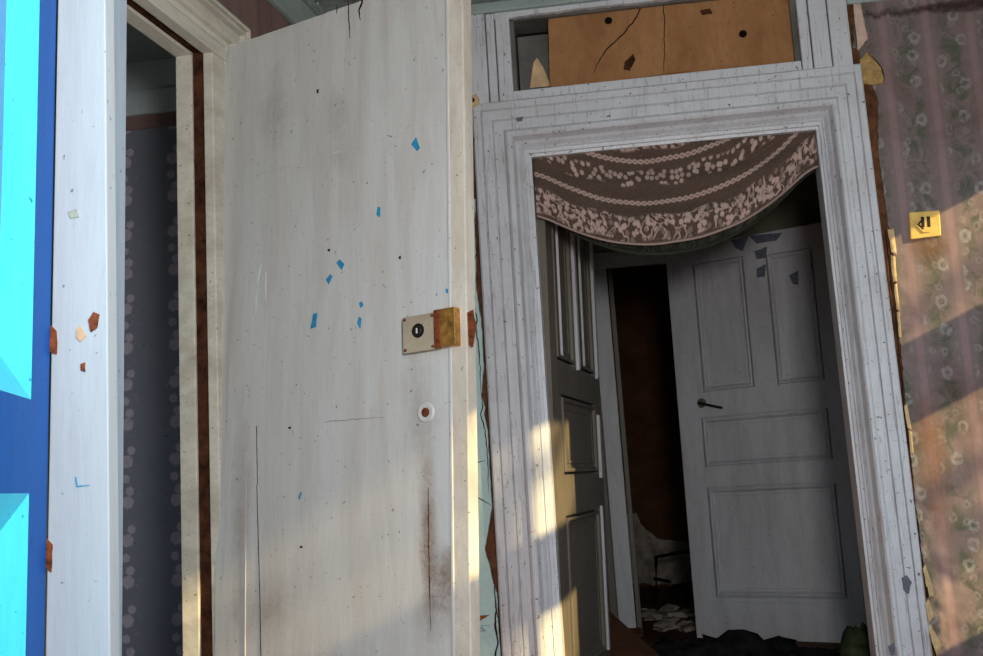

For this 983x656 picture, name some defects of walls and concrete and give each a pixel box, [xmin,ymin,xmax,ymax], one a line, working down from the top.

crack [594,6,665,72]
peeling [467,310,476,347]
crack [475,306,490,505]